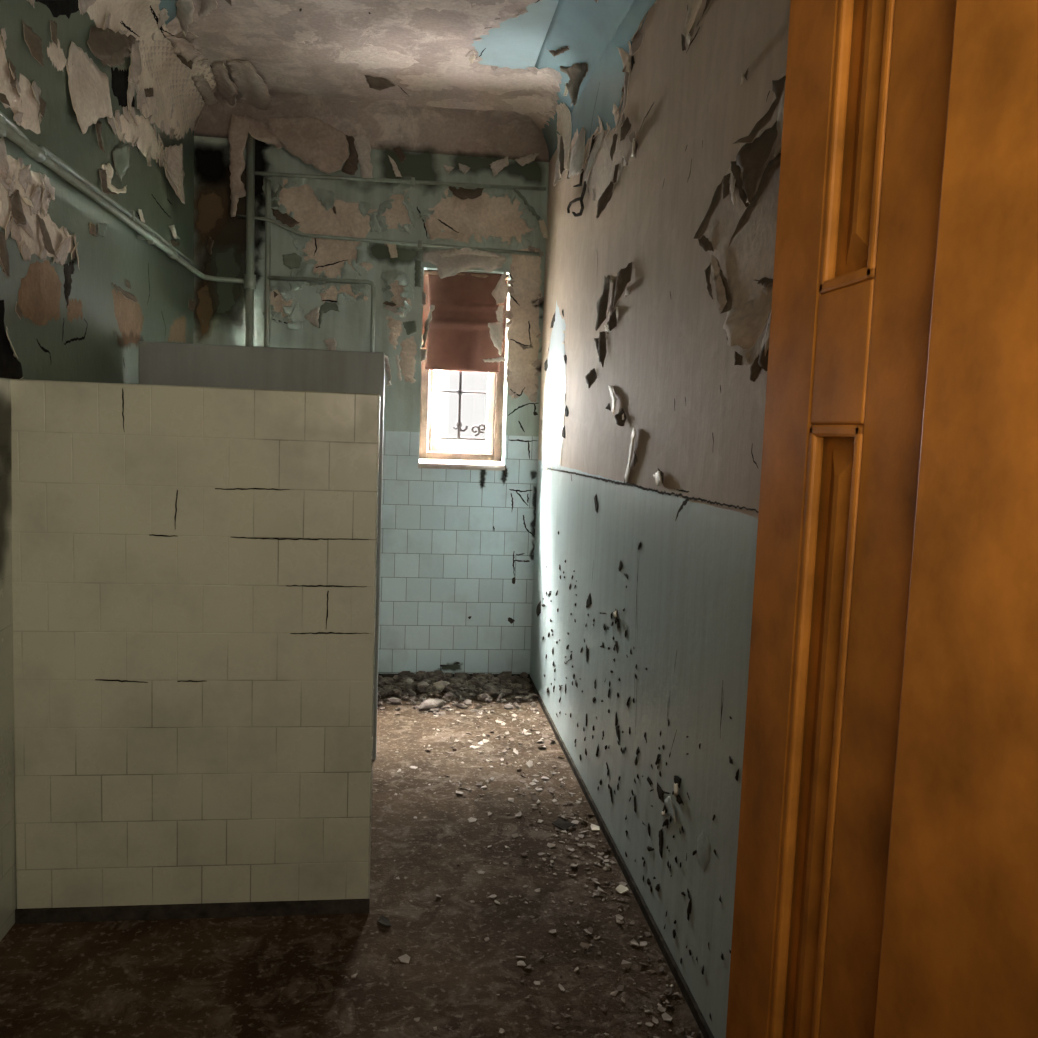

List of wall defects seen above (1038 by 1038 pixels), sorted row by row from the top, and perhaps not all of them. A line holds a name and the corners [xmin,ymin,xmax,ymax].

peeling [0,28,46,134]
peeling [22,0,657,247]
peeling [681,0,712,51]
peeling [0,137,87,379]
peeling [262,172,569,471]
peeling [585,255,633,388]
peeling [693,73,786,382]
damp [0,401,12,567]
peeling [606,385,638,482]
peeling [653,468,664,486]
spalling [536,560,697,894]
spalling [664,888,691,939]